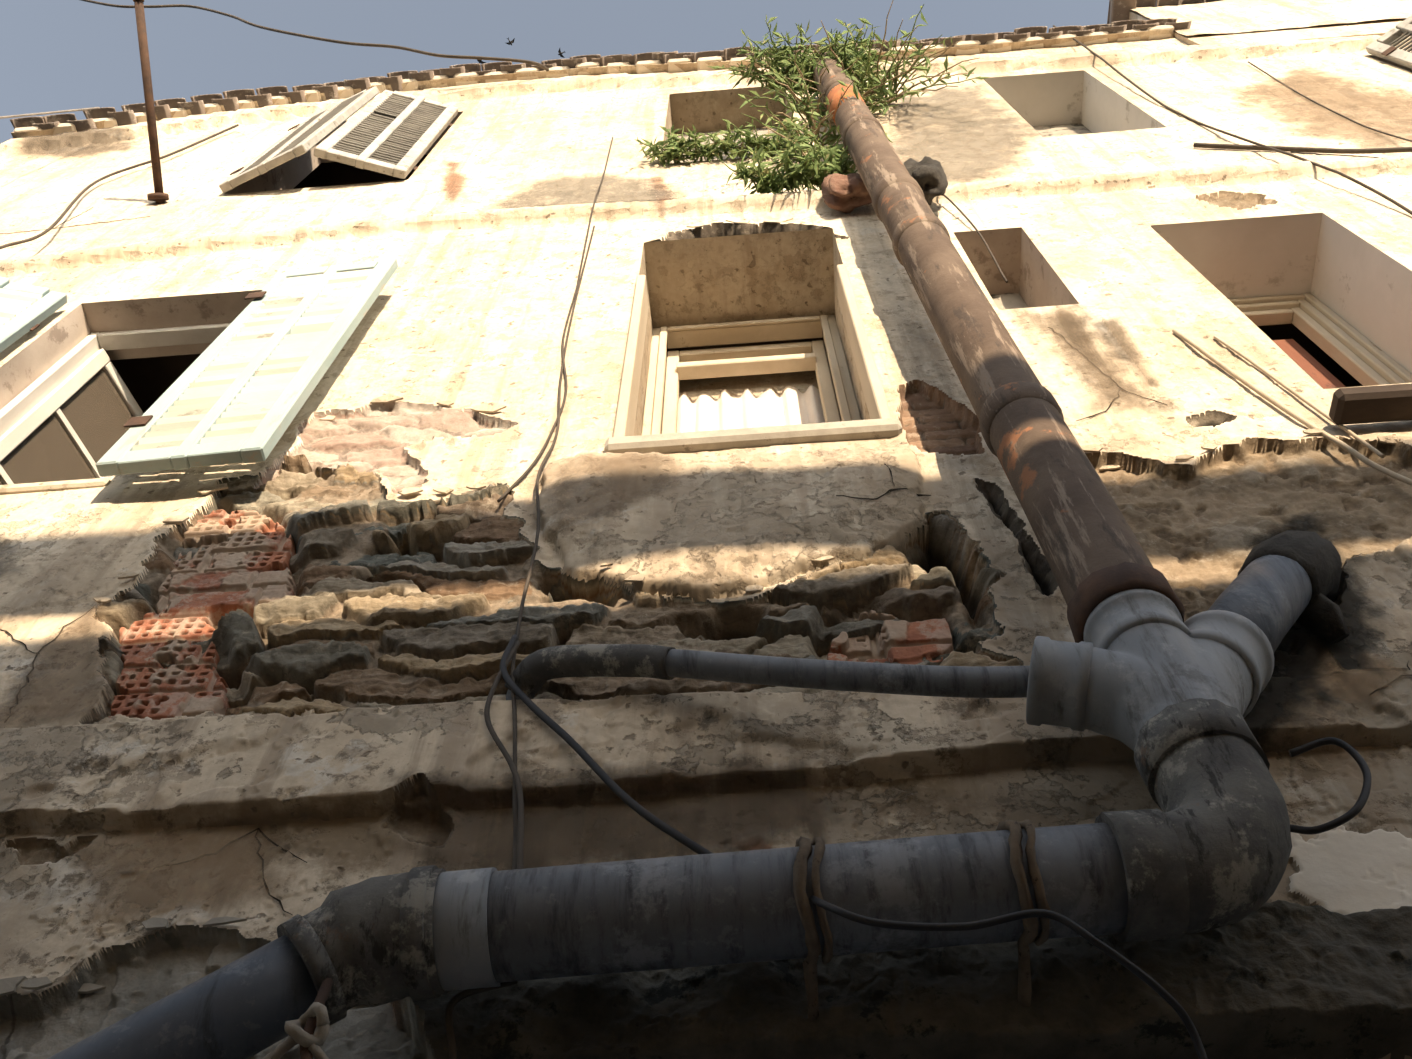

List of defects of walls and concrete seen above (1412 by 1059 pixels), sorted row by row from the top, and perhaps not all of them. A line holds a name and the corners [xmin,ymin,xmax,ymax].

water stain [1245,71,1412,147]
peeling [1196,191,1278,210]
spalling [896,380,985,456]
peeling [1186,410,1237,427]
spalling [81,394,1024,724]
spalling [975,478,1058,596]
spalling [1081,428,1412,622]
water stain [1249,514,1321,547]
water stain [1244,554,1399,752]
crack [224,828,307,915]
spalling [0,916,271,1059]
spalling [248,997,436,1059]